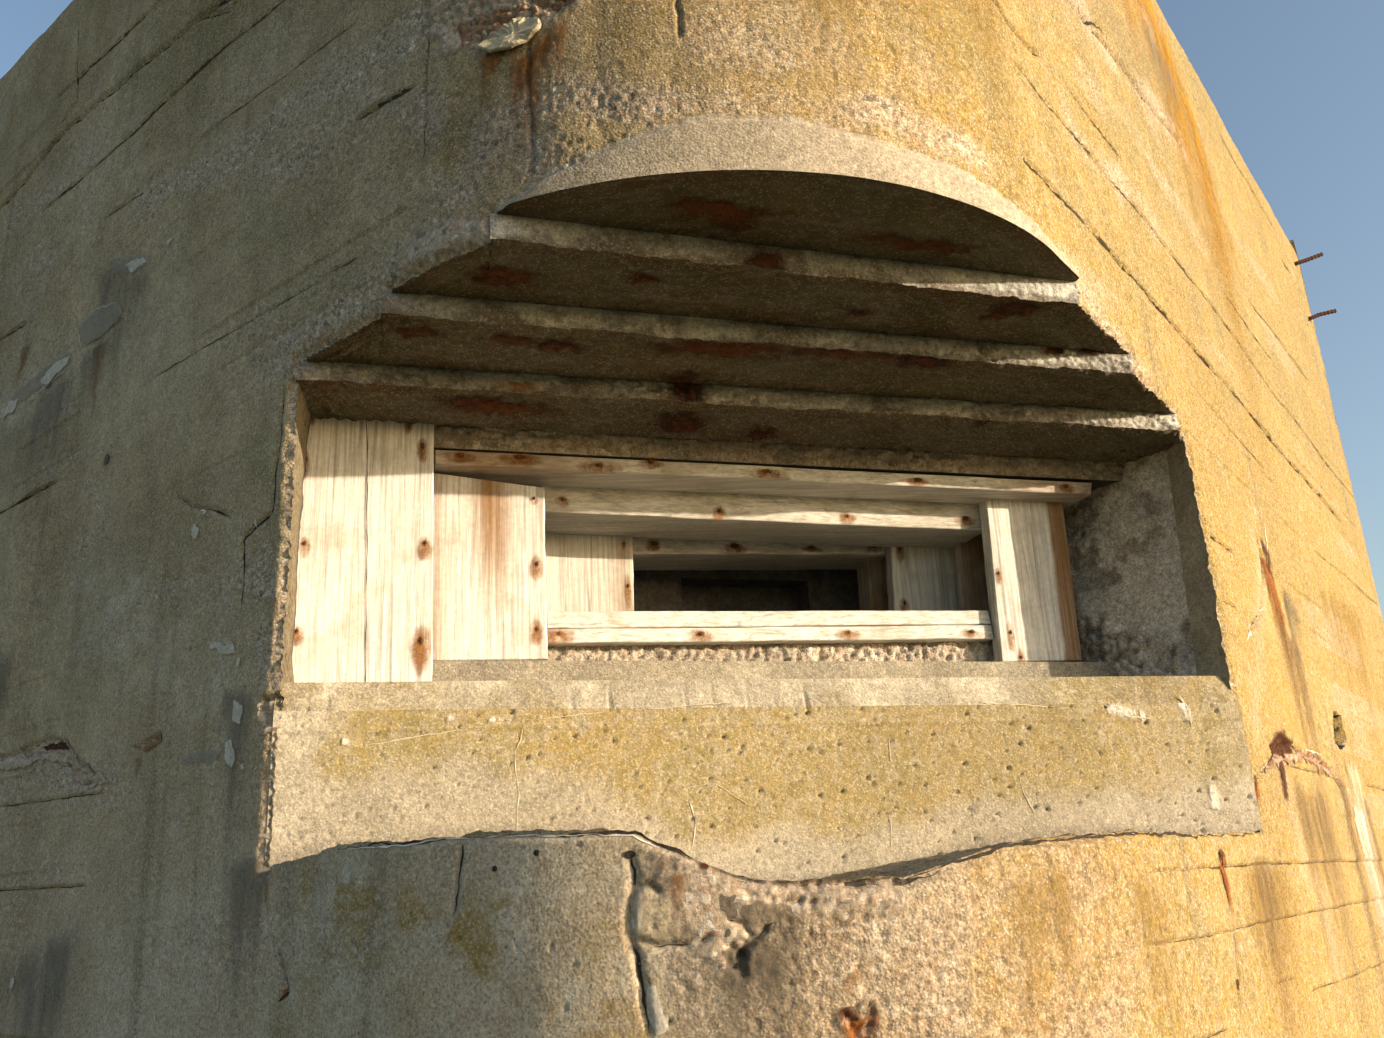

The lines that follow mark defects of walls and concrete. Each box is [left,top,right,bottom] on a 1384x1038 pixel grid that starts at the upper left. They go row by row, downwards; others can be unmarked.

spalling [422,0,584,57]
rust [656,340,947,369]
rust [659,371,708,433]
rust [405,422,427,461]
rust [1260,540,1308,707]
crack [967,695,1193,725]
spalling [0,740,110,788]
rust [1255,730,1342,801]
crack [340,702,1258,1033]
rust [1220,849,1233,904]
spalling [654,852,906,978]